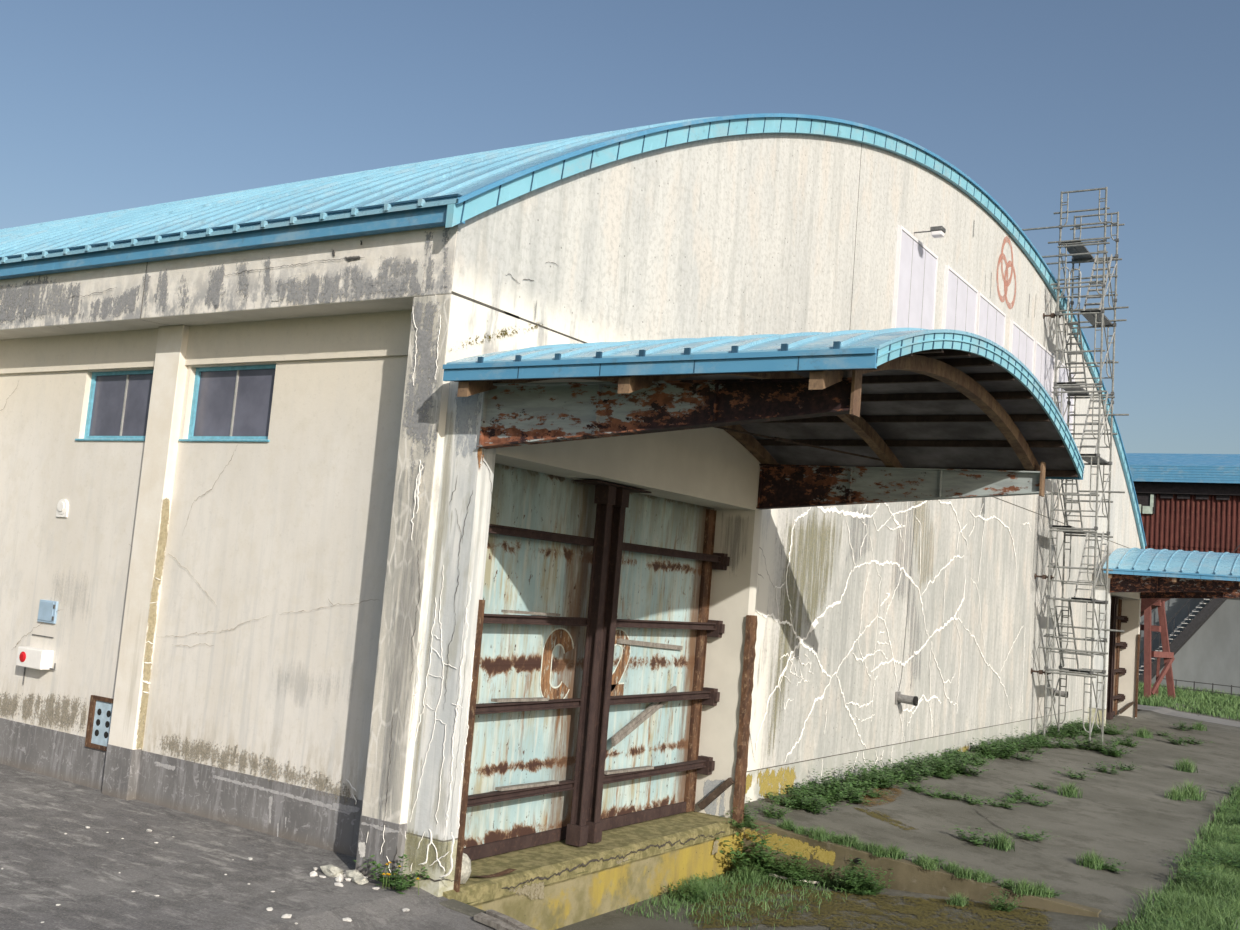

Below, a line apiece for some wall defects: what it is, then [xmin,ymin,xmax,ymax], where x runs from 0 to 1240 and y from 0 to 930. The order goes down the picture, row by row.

damp [0,269,189,324]
damp [205,262,249,309]
damp [262,227,449,475]
crack [413,314,441,386]
crack [142,554,372,693]
crack [366,449,493,882]
crack [750,500,1041,775]
damp [0,692,86,732]
damp [160,734,357,804]